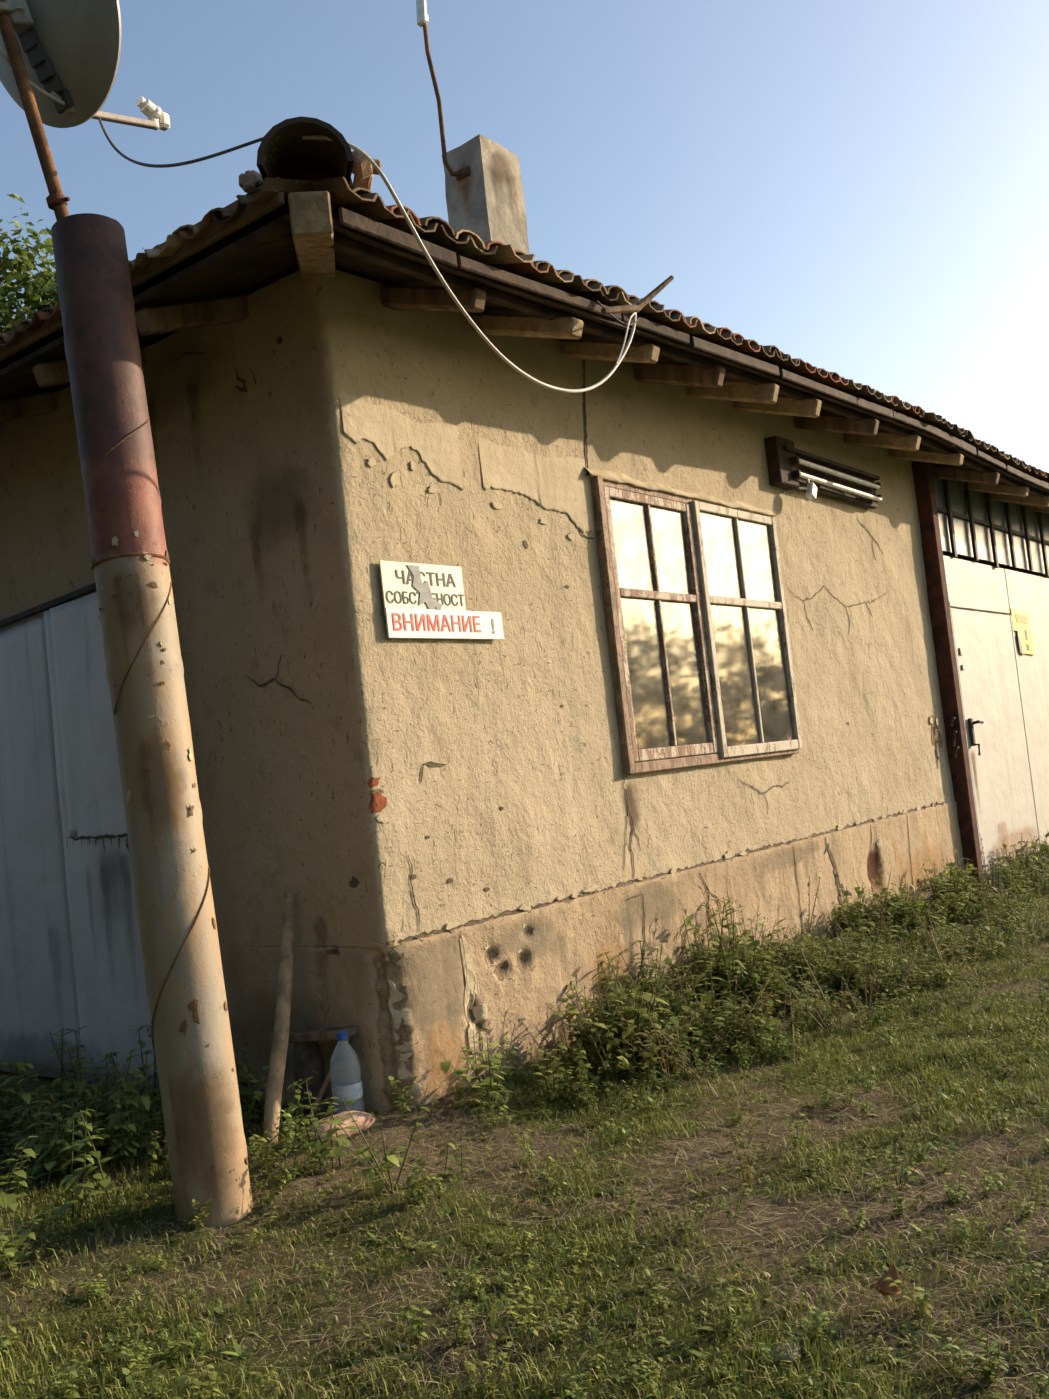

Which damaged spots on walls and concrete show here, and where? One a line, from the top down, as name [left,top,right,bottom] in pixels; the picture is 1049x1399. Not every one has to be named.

crack [795,586,886,630]
crack [247,655,312,704]
flaking render [367,766,389,823]
crack [399,778,945,1080]
corrosion [179,999,200,1035]
spalling [373,940,422,1109]
spalling [459,924,534,1055]